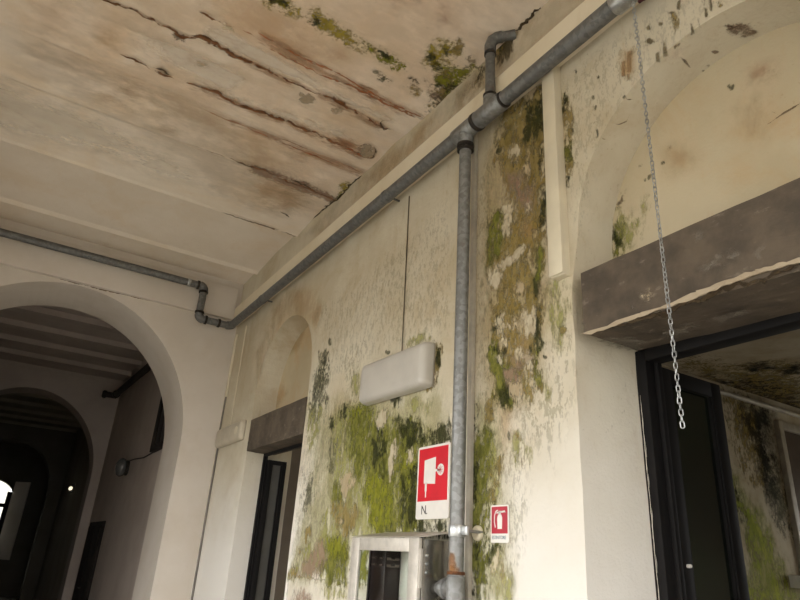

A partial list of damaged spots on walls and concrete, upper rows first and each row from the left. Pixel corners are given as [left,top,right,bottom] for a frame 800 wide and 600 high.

crack [120,54,377,219]
crack [103,0,421,130]
leakage [428,56,485,112]
crack [516,8,541,31]
leakage [308,338,331,450]
leakage [407,334,443,392]
leakage [547,280,568,345]
leakage [678,356,800,535]